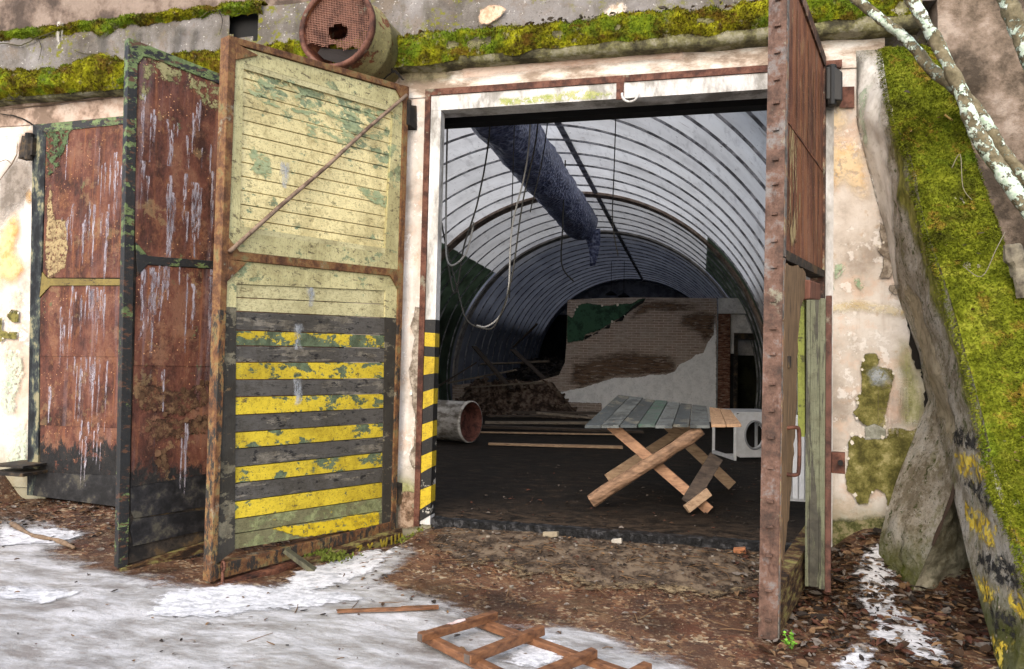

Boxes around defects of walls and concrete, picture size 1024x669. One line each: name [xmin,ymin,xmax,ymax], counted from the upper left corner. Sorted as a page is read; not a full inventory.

peeling [249,76,389,145]
water stain [141,94,214,342]
peeling [247,146,272,177]
peeling [357,186,387,208]
peeling [567,299,645,342]
peeling [561,324,716,422]
peeling [856,59,1024,669]
peeling [845,353,917,509]